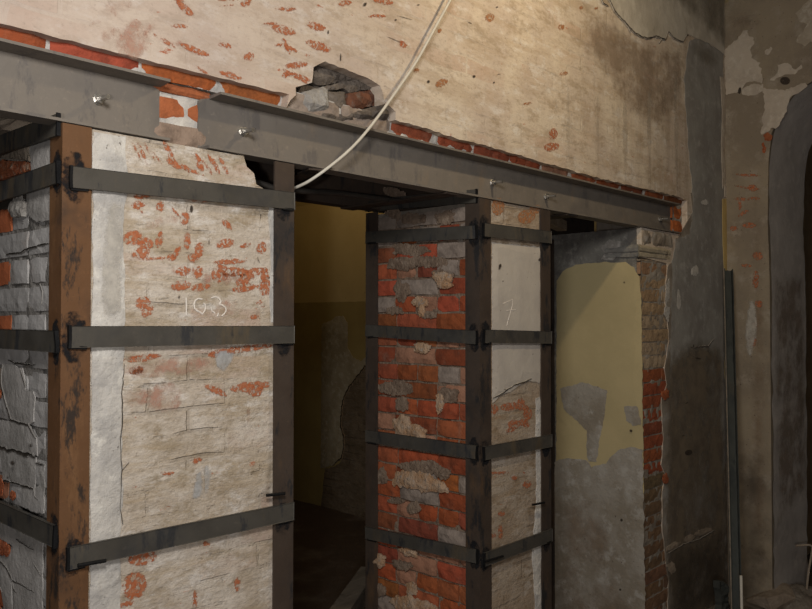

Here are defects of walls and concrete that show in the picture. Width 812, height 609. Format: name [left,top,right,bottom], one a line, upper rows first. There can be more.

spalling [0,22,682,232]
crack [601,0,688,44]
peeling [720,30,808,270]
peeling [320,316,366,468]
peeling [555,259,712,609]